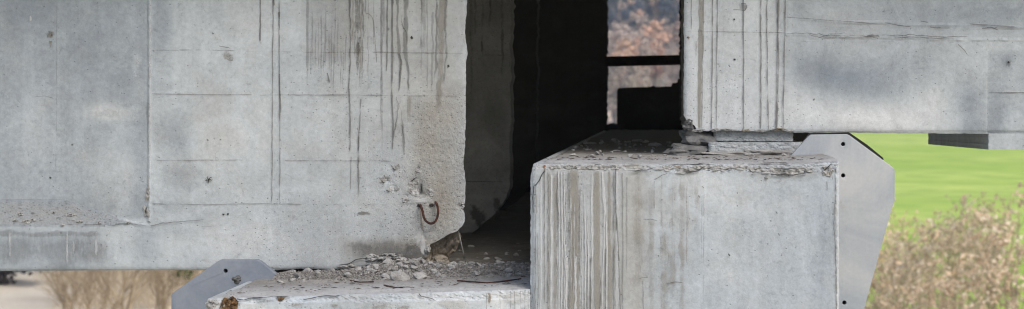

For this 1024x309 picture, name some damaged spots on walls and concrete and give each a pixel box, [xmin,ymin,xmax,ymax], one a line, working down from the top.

water stain [435,0,446,104]
water stain [348,0,409,190]
spalling [379,164,434,203]
spalling [549,162,834,179]
spalling [424,230,461,263]
water stain [505,169,623,309]
rust [221,296,238,309]